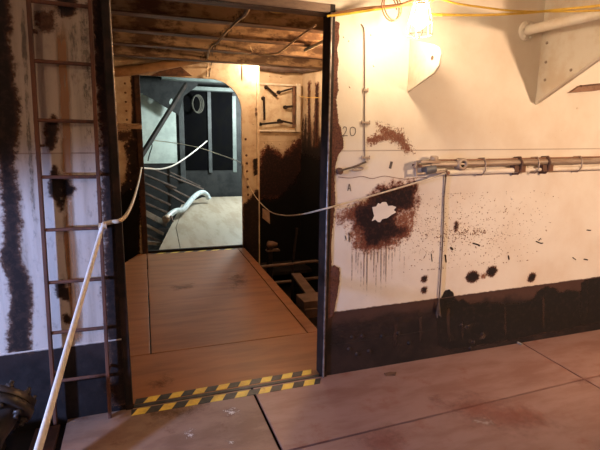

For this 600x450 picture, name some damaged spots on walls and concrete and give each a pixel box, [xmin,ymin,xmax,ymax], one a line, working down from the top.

rust [0,0,33,354]
rust [34,0,125,406]
rust [243,82,321,292]
rust [328,21,344,318]
peeling [372,202,396,222]
rust [366,122,416,154]
rust [403,192,529,294]